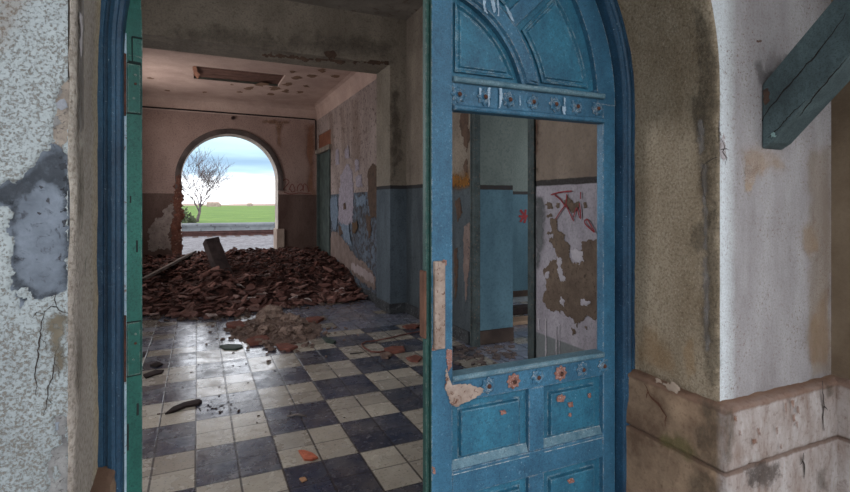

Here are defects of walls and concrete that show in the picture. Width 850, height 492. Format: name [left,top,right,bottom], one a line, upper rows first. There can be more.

spalling [0,0,85,308]
peeling [136,174,185,255]
peeling [330,145,377,290]
peeling [542,195,597,335]
crack [32,294,68,412]
crack [644,384,667,421]
spalling [655,378,680,394]
crack [821,381,829,428]